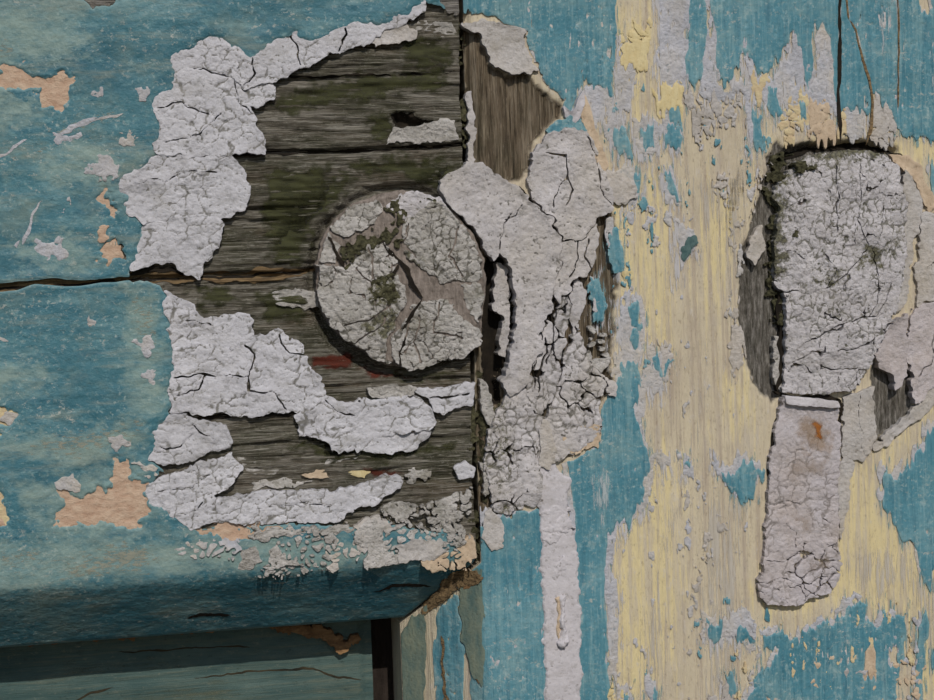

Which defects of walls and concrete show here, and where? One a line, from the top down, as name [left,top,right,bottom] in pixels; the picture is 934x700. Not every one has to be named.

peeling [0,61,76,112]
crack [289,70,455,79]
crack [459,18,539,76]
crack [784,0,903,161]
spalling [53,123,82,145]
peeling [84,0,459,280]
spalling [34,236,69,261]
crack [234,91,638,551]
peeling [561,0,934,700]
peeling [0,407,19,436]
peeling [28,257,514,580]
peeling [0,492,9,526]